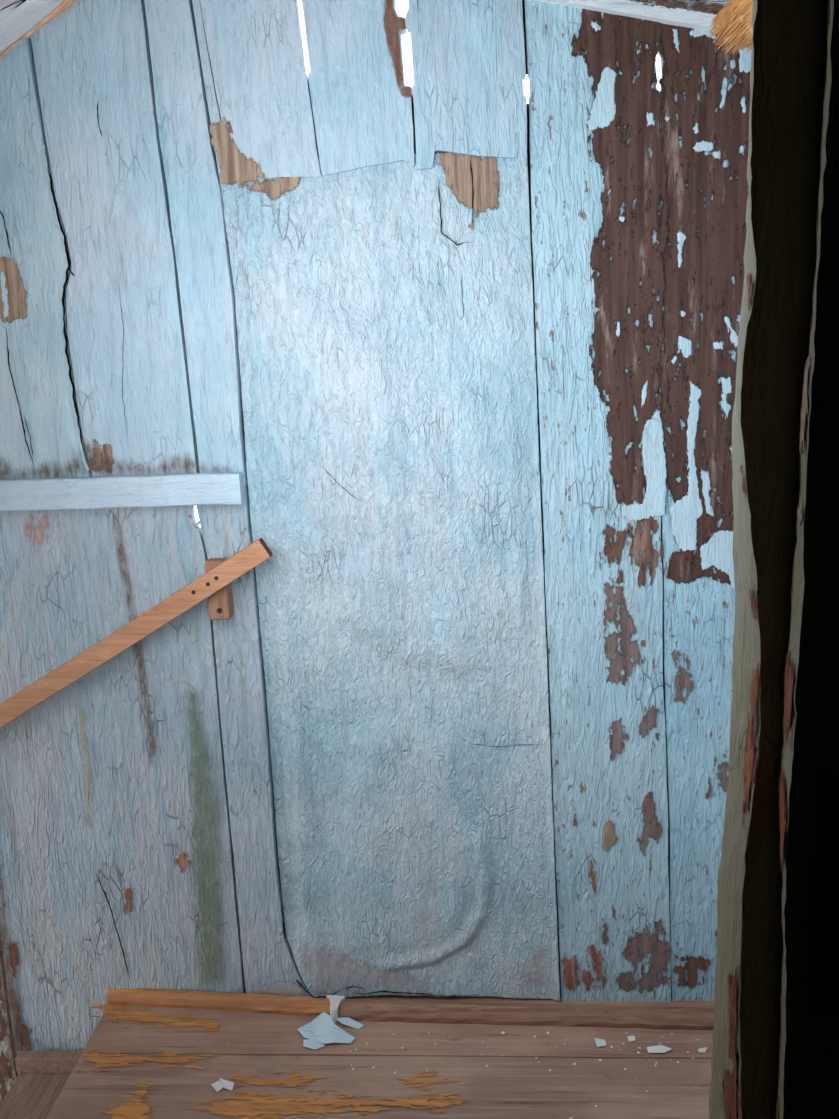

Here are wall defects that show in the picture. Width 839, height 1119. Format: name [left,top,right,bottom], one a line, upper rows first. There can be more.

peeling [209,117,303,201]
peeling [437,151,500,230]
peeling [0,256,28,323]
crack [41,145,90,471]
peeling [570,0,755,686]
leakage [38,446,194,477]
peeling [669,648,694,705]
peeling [608,705,660,761]
peeling [778,651,795,876]
peeling [601,820,618,853]
peeling [638,791,662,855]
peeling [560,918,710,993]